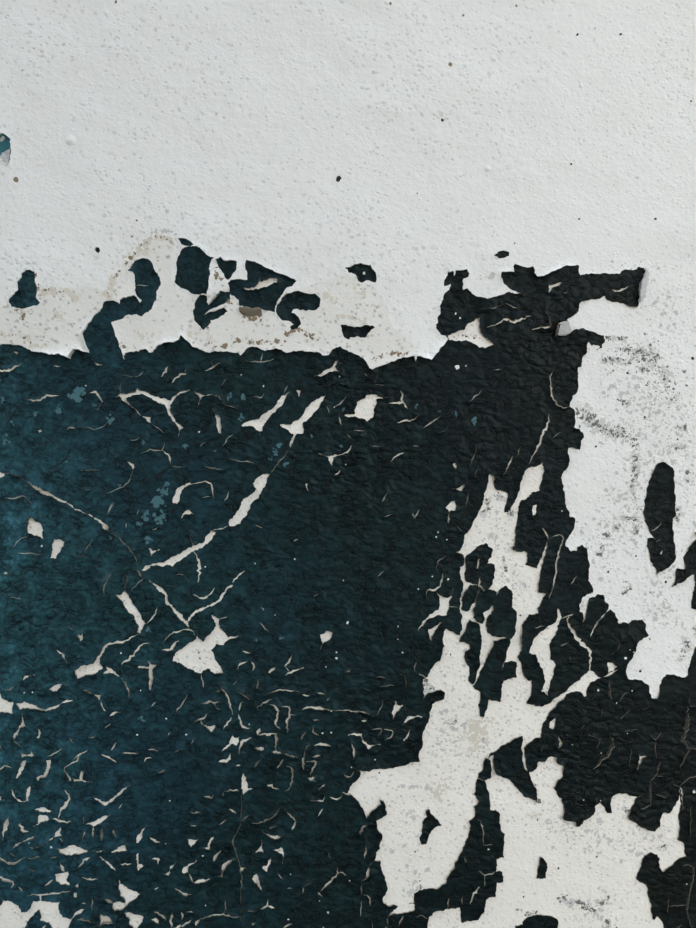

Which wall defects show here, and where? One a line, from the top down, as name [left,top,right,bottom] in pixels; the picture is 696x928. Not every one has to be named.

spalling [9,270,40,309]
spalling [175,238,321,330]
spalling [448,318,493,348]
crack [327,384,403,460]
spalling [344,394,387,421]
crack [392,372,447,433]
crack [506,373,567,470]
crack [42,362,289,599]
spalling [643,462,696,609]
crack [426,558,454,607]
crack [99,609,192,691]
spalling [0,900,84,928]